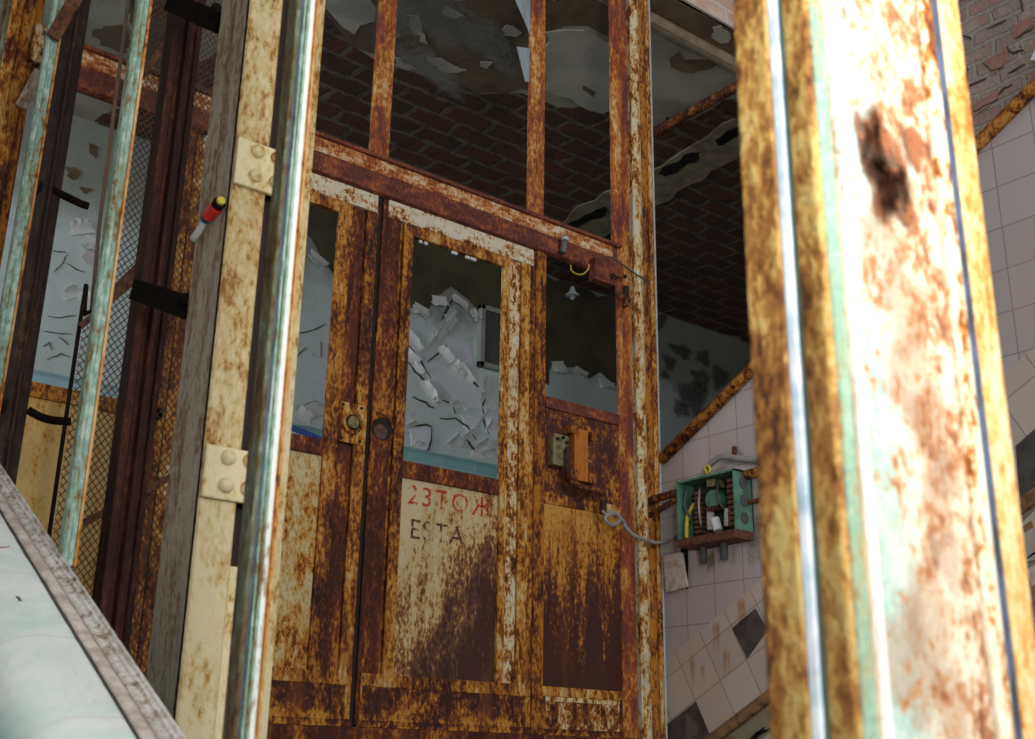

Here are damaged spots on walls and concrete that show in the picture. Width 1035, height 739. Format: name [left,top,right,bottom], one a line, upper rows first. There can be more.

flaking render [95,108,120,130]
flaking render [91,0,135,53]
flaking render [135,114,154,141]
flaking render [145,0,168,70]
peeling [307,204,338,274]
flaking render [315,0,378,150]
flaking render [389,0,529,209]
flaking render [544,0,611,241]
flaking render [650,0,736,57]
flaking render [653,98,750,344]
rust [854,104,925,234]
peeling [545,256,617,391]